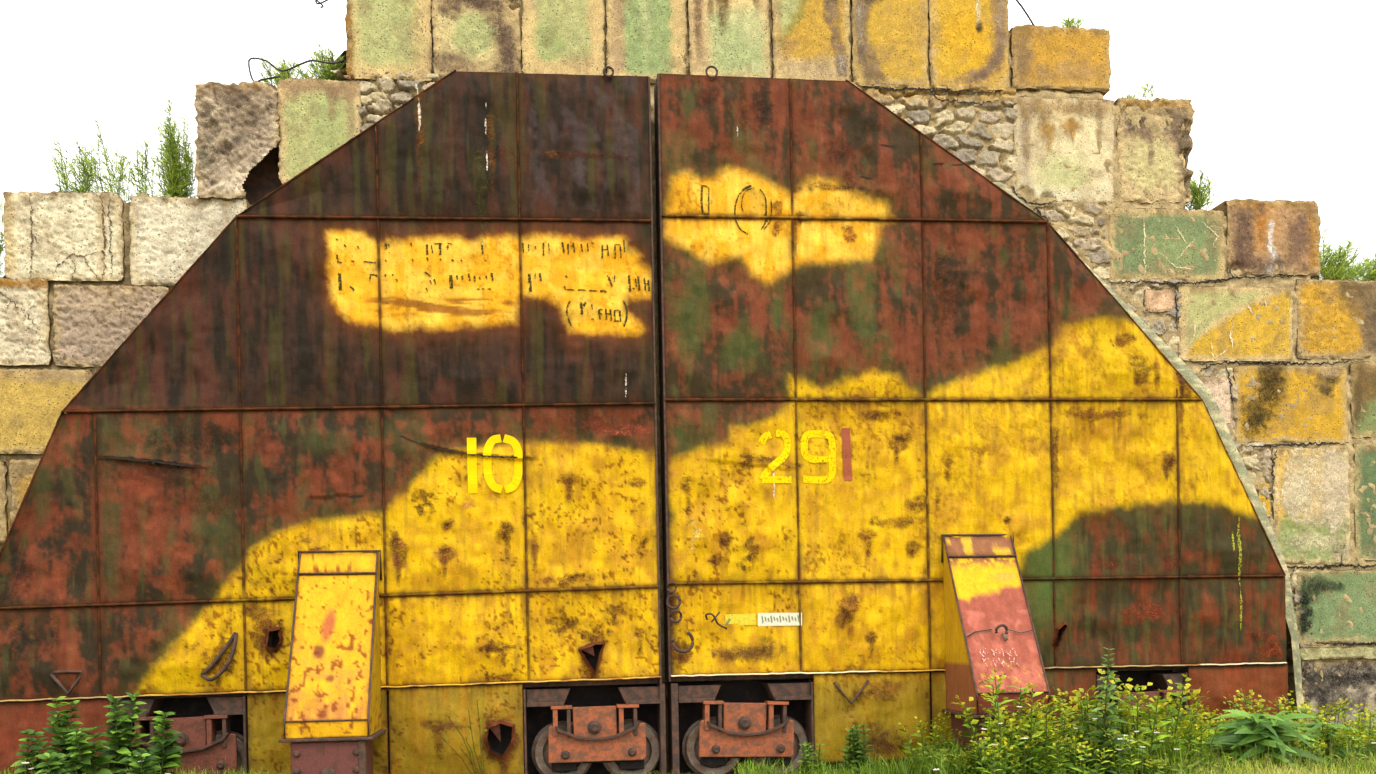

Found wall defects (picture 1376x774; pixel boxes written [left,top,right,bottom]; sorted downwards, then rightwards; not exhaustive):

damp [438,0,518,73]
spalling [198,83,278,185]
rust [1110,334,1160,385]
damp [1240,366,1285,435]
rust [390,532,407,579]
rust [437,523,454,573]
rust [498,522,513,554]
rust [711,533,759,570]
rust [859,496,939,555]
rust [836,594,878,655]
rust [479,643,515,682]
rust [670,638,780,667]